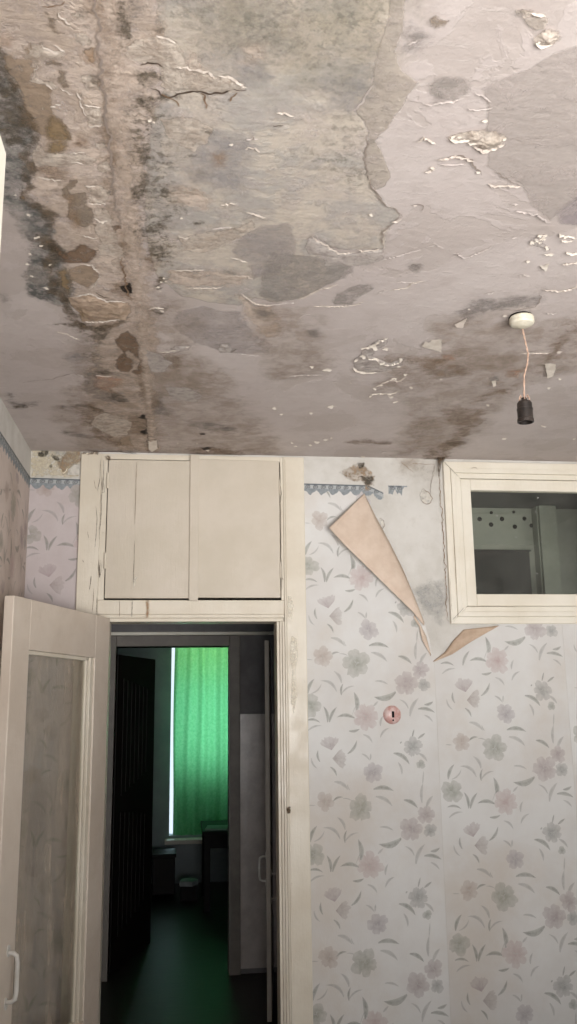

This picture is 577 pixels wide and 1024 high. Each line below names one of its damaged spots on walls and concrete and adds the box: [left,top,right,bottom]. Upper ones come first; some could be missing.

peeling [3,45,71,140]
crack [140,62,246,109]
peeling [426,78,506,154]
peeling [127,0,492,337]
damp [0,0,183,451]
peeling [511,203,577,277]
peeling [353,338,413,403]
peeling [545,351,562,389]
peeling [91,413,132,436]
spalling [32,451,110,476]